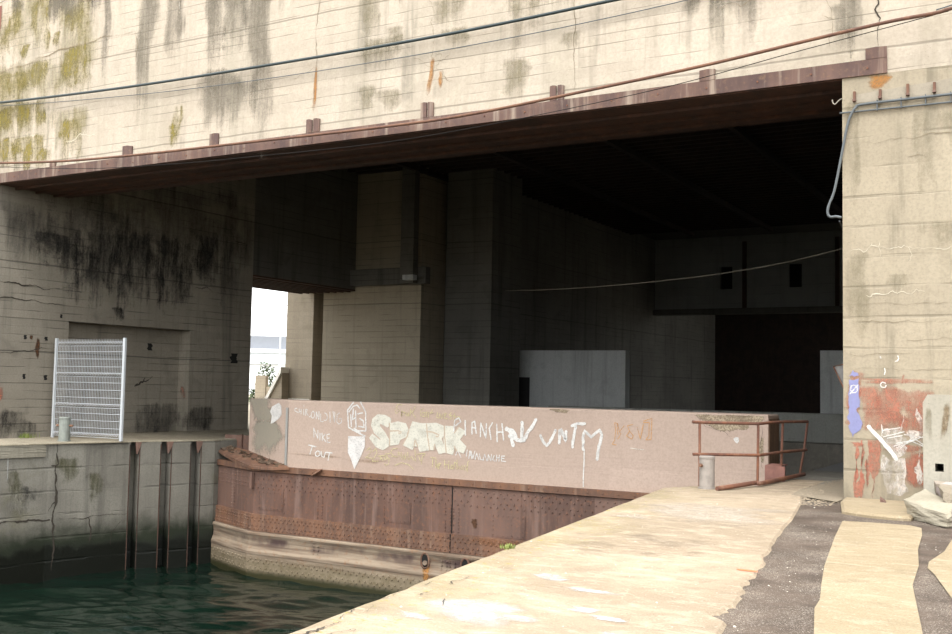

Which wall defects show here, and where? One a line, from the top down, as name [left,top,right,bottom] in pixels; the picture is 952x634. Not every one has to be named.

leakage [0,0,93,169]
leakage [137,0,158,75]
leakage [166,0,185,39]
leakage [204,0,269,115]
leakage [12,215,249,318]
peeling [847,371,931,498]
crack [0,447,124,567]
crack [305,577,467,634]